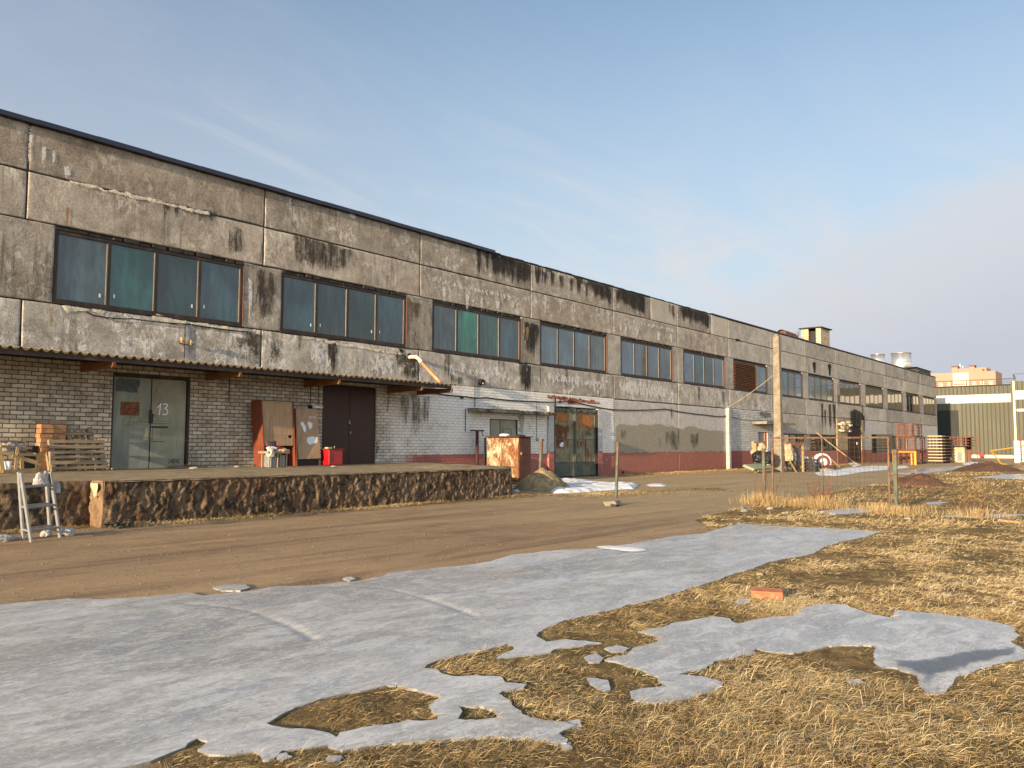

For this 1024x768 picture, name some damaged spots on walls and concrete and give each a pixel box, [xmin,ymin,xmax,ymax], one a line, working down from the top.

leakage [295,233,351,269]
leakage [248,270,274,318]
leakage [476,249,645,313]
leakage [669,305,709,327]
leakage [395,352,420,379]
leakage [519,322,541,390]
corrosion [555,412,593,466]